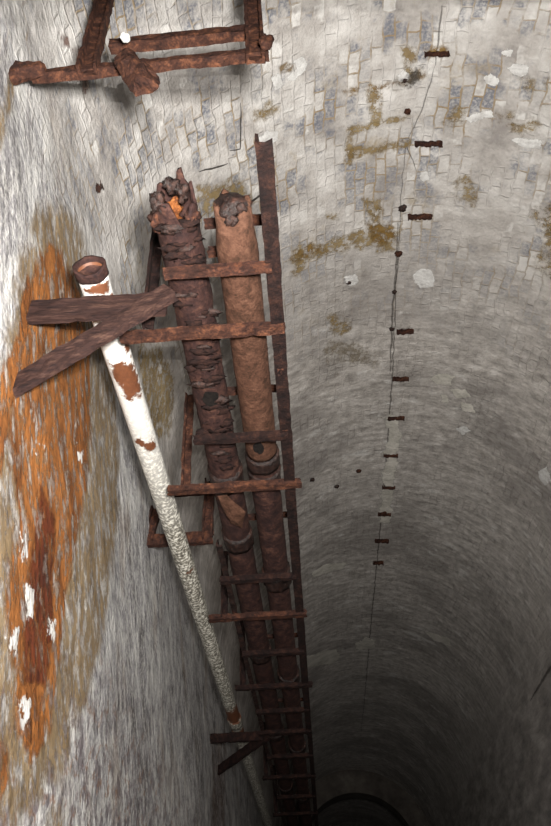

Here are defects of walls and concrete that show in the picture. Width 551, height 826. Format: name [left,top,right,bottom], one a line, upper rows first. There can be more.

damp [346,47,425,165]
damp [292,198,400,274]
damp [534,205,551,275]
corrosion [0,207,119,822]